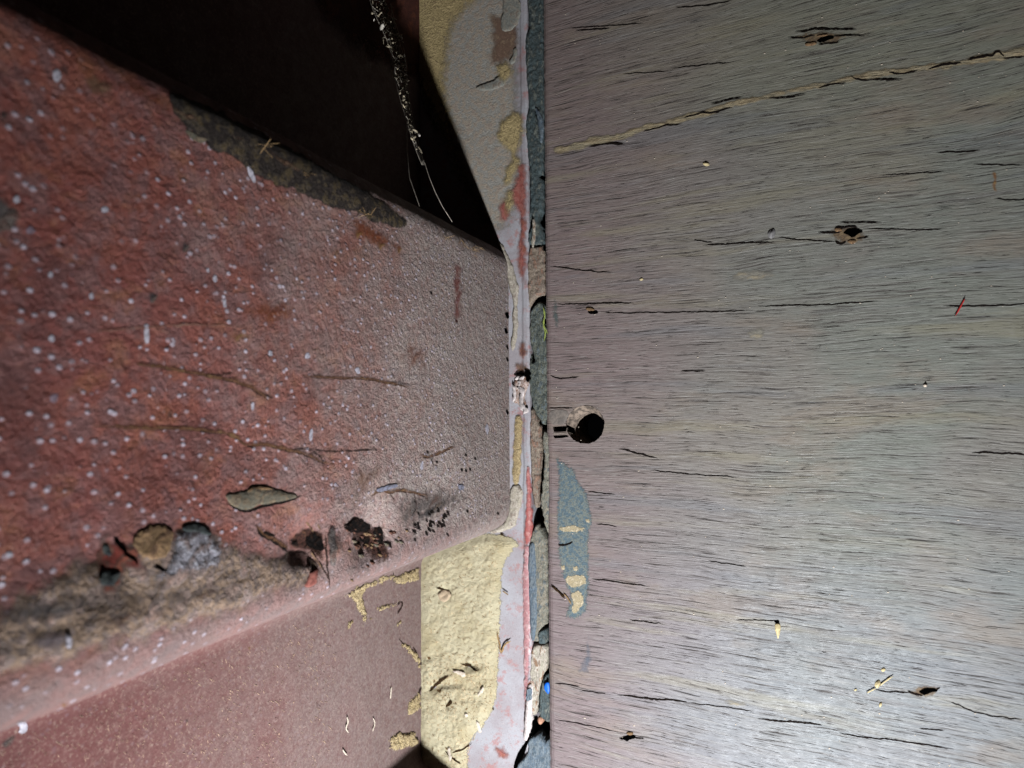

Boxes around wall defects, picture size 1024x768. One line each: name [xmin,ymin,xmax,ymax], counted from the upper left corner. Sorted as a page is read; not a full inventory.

peeling [501,0,521,32]
peeling [476,75,507,91]
crack [625,62,729,74]
crack [136,363,274,401]
crack [308,375,409,388]
crack [92,424,380,466]
crack [420,446,454,464]
peeling [225,485,300,513]
spalling [289,499,450,568]
spalling [96,525,176,592]